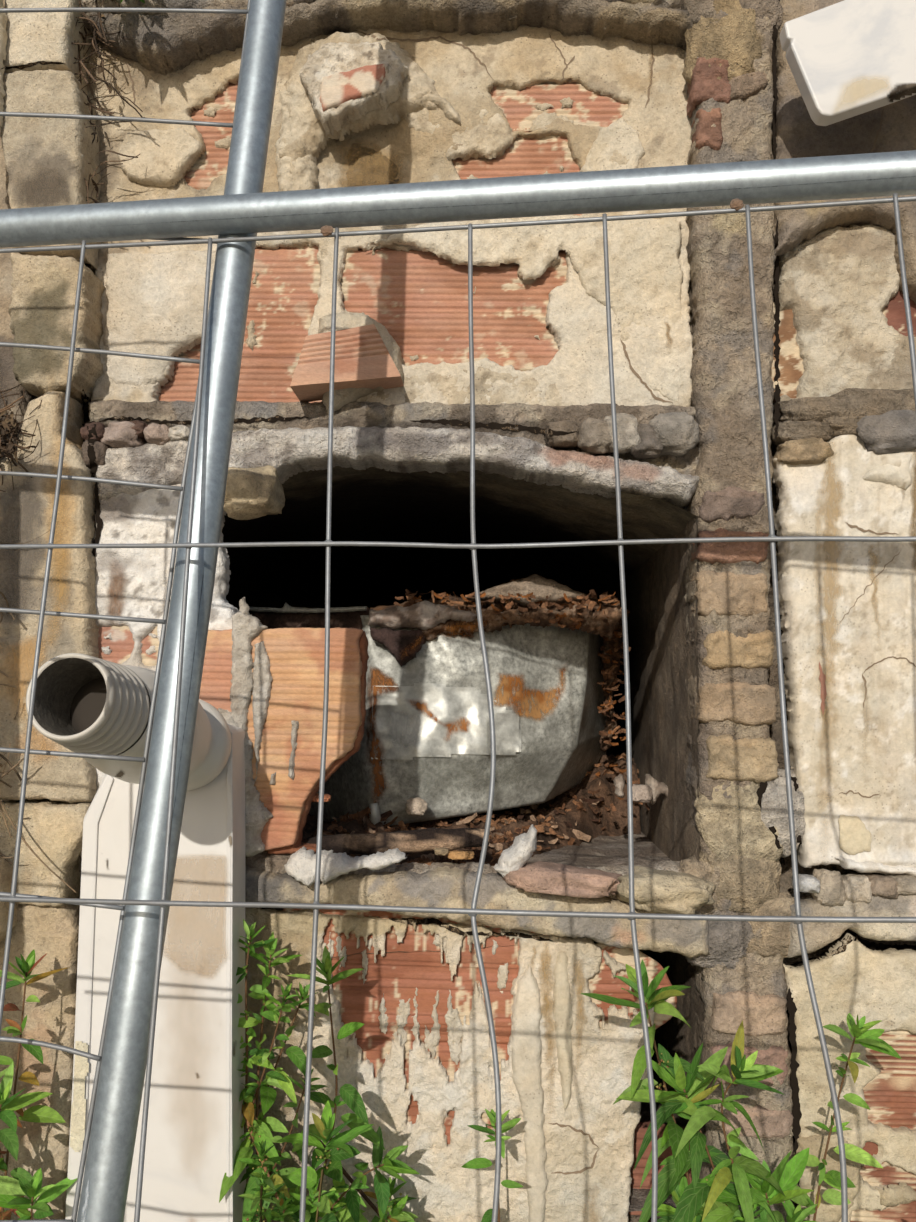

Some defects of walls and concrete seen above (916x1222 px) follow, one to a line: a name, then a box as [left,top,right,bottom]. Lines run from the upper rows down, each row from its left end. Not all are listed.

spalling [184,81,238,190]
spalling [278,32,440,176]
spalling [452,79,629,180]
spalling [236,245,568,414]
crack [773,214,781,441]
spalling [770,302,804,403]
spalling [882,291,916,337]
damp [822,458,841,685]
spalling [282,903,550,1124]
spalling [588,943,677,1030]
crack [786,931,916,1187]
spalling [863,1030,916,1130]